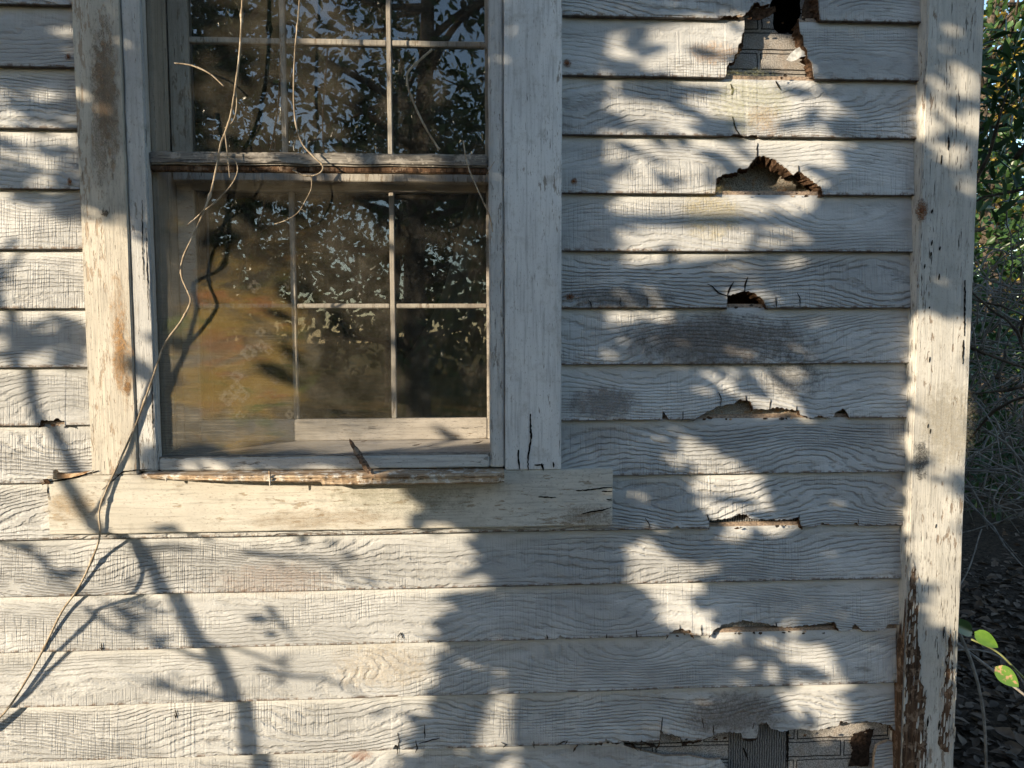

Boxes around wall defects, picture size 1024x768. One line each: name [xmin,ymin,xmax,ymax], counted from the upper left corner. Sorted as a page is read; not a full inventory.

spalling [737,0,813,34]
peeling [786,47,806,62]
crack [517,414,555,471]
peeling [884,562,958,768]